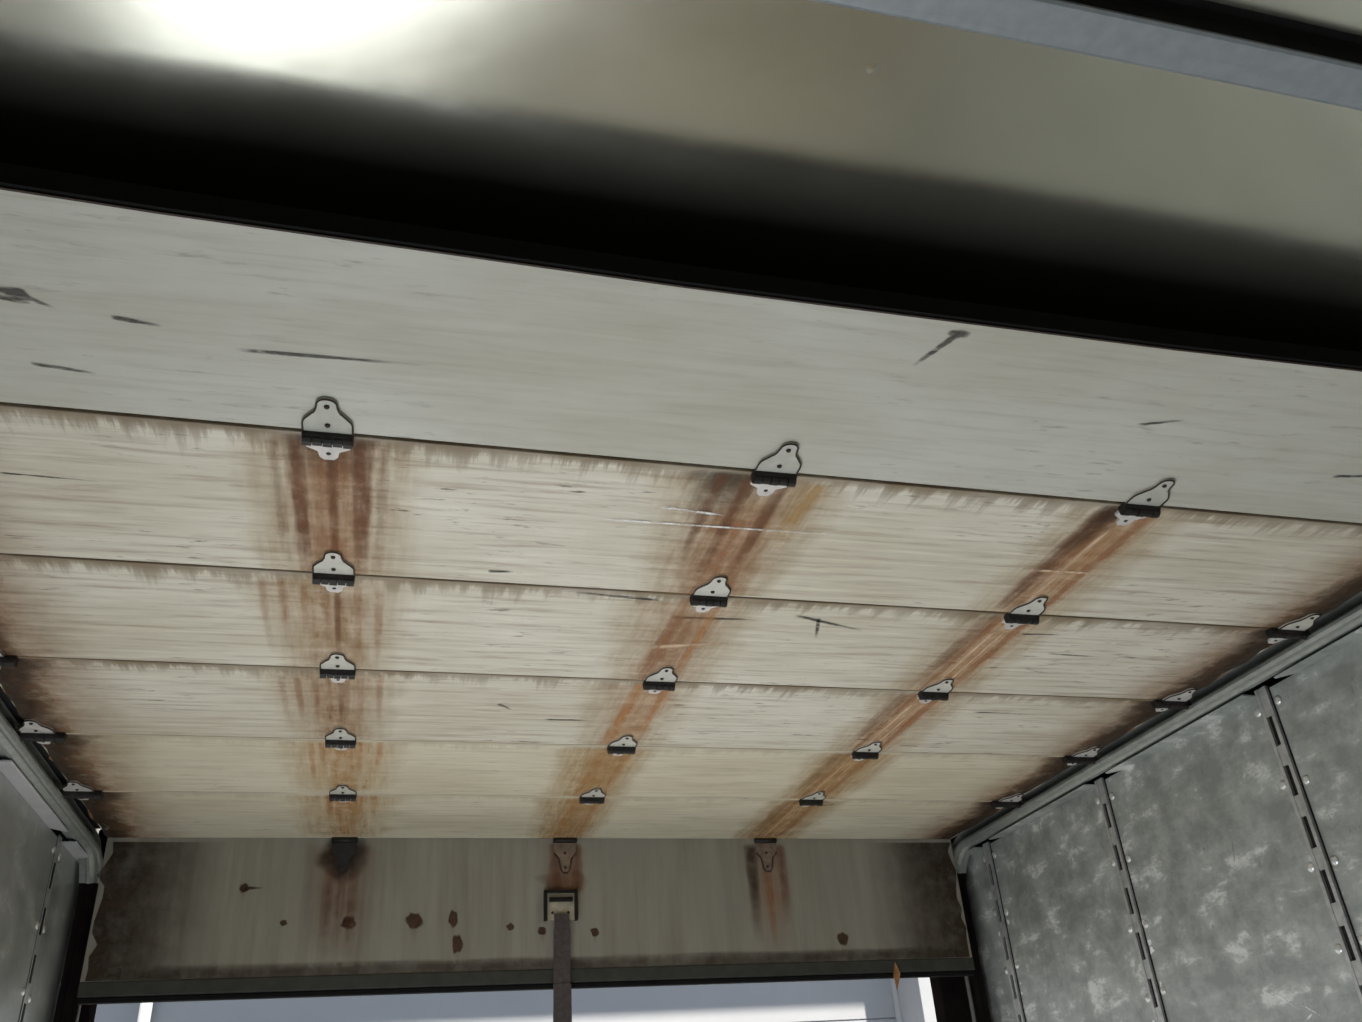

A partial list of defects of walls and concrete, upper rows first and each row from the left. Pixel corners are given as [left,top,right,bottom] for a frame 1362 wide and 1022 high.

corrosion [291,441,369,553]
corrosion [684,474,820,587]
corrosion [1013,508,1148,605]
corrosion [947,624,1026,679]
corrosion [748,699,935,904]
corrosion [342,917,356,928]
corrosion [406,913,422,928]
corrosion [448,910,463,953]